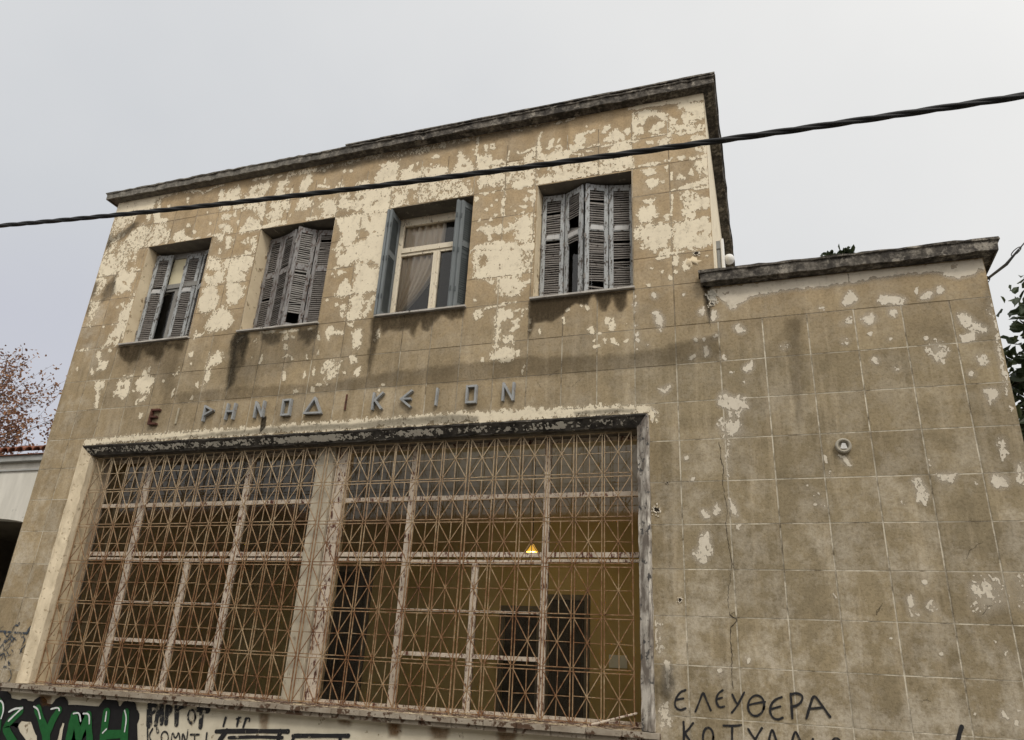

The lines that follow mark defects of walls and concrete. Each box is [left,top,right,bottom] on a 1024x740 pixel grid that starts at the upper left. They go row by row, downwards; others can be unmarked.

peeling [76,93,712,419]
peeling [698,259,985,336]
damp [228,333,249,386]
peeling [924,336,951,364]
peeling [83,402,659,454]
peeling [716,394,750,477]
peeling [928,459,957,483]
peeling [901,477,929,506]
peeling [701,498,741,530]
peeling [692,531,713,564]
peeling [907,594,938,617]
peeling [967,574,1024,613]